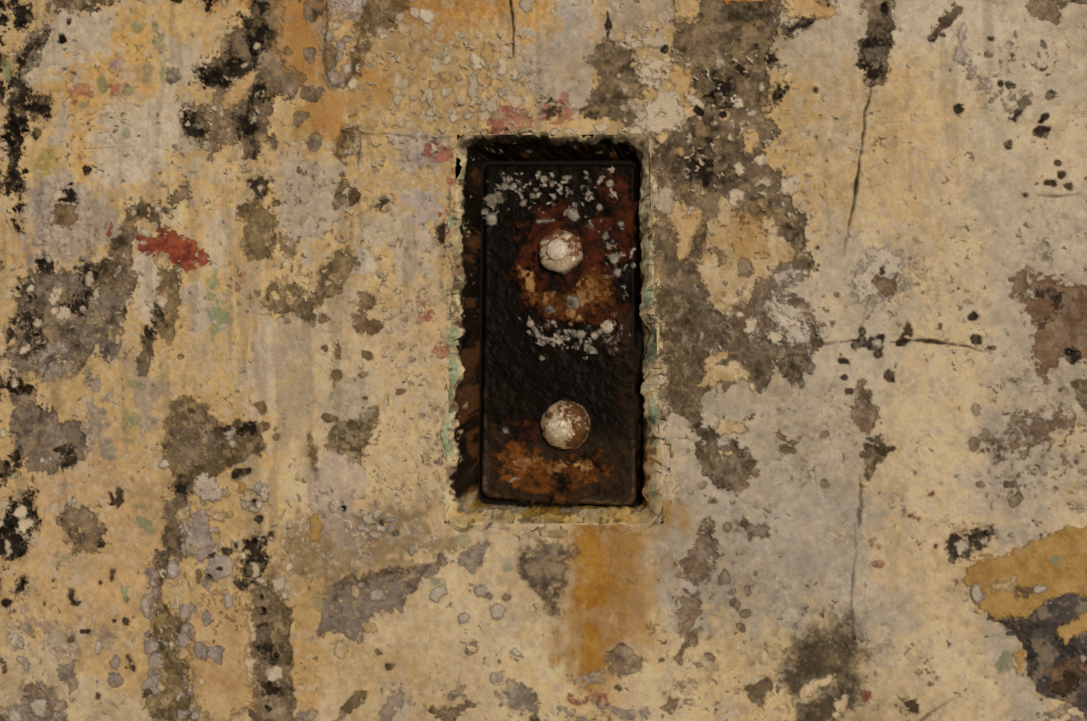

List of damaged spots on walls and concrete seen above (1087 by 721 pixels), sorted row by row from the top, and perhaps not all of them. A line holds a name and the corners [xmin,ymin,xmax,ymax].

peeling [1025,0,1087,25]
crack [849,91,871,223]
peeling [998,80,1055,122]
peeling [1033,113,1051,138]
rust [489,174,640,507]
crack [815,311,996,352]
peeling [1008,269,1087,385]
peeling [1,574,29,608]
peeling [67,395,279,721]
peeling [247,486,492,721]
rust [568,525,622,688]
peeling [964,524,1087,721]